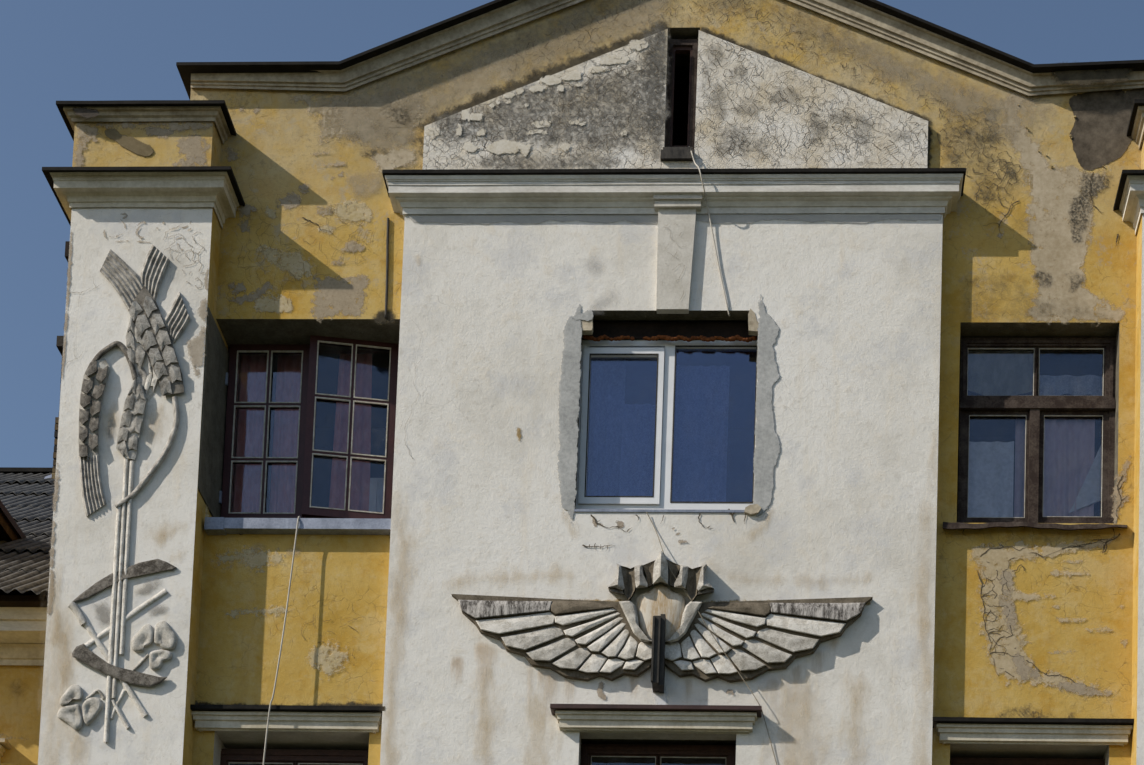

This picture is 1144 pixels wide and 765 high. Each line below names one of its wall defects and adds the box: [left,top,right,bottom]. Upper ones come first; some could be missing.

peeling [73,121,212,167]
peeling [372,148,417,173]
damp [438,24,669,169]
crack [428,0,1021,232]
peeling [1000,88,1144,323]
peeling [310,241,369,320]
peeling [970,455,1131,696]